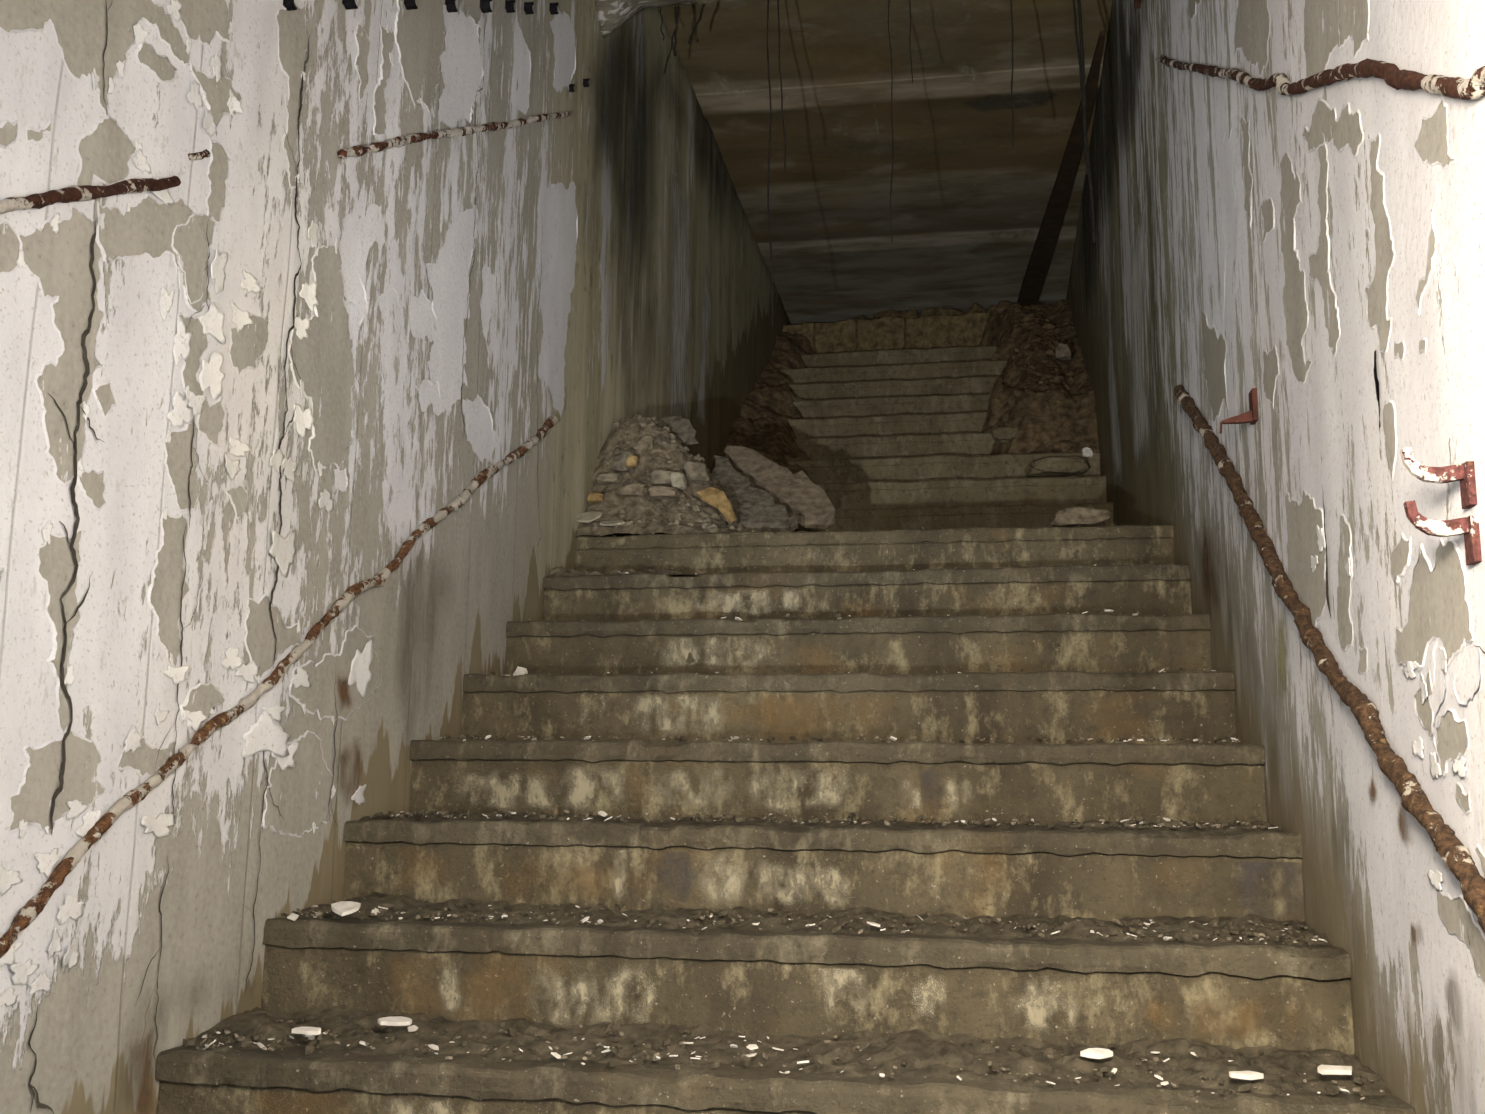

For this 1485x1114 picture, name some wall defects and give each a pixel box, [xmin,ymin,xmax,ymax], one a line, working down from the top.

crack [48,220,104,835]
peeling [0,0,269,878]
peeling [269,220,354,512]
peeling [354,0,446,137]
damp [596,35,654,333]
damp [670,182,711,425]
peeling [1240,98,1427,409]
peeling [1304,0,1370,78]
peeling [222,594,382,838]
corrosion [339,680,350,704]
peeling [1390,531,1475,815]
peeling [1427,870,1485,984]